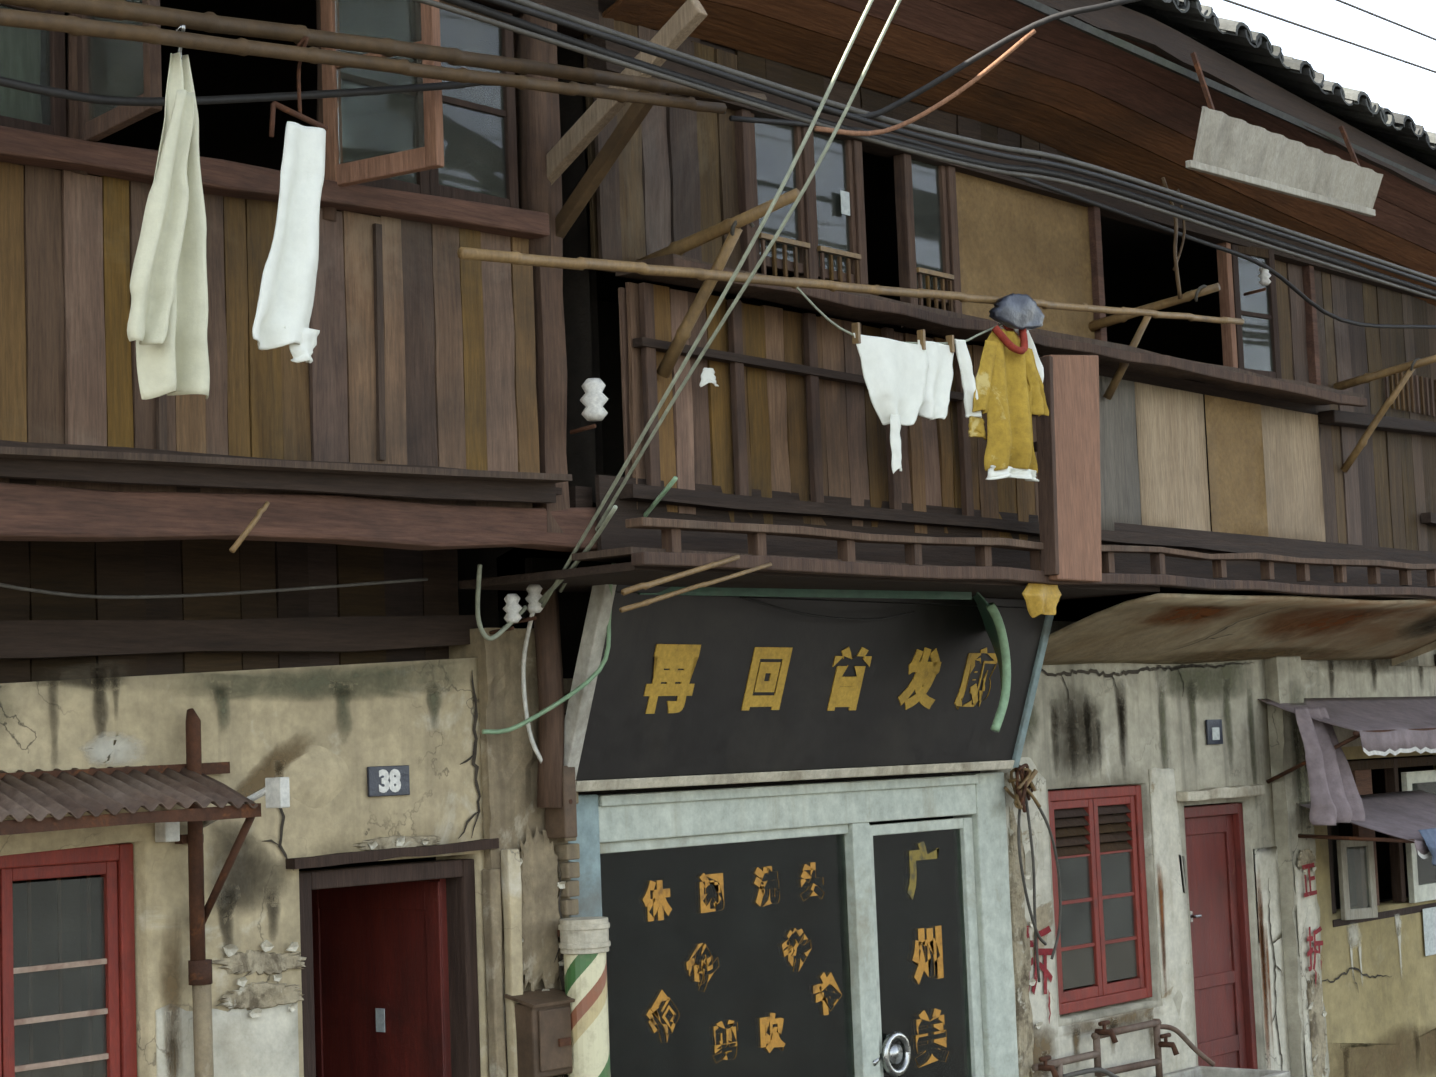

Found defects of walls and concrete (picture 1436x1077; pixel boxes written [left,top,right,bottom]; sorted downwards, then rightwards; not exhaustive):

corrosion [1154,606,1230,624]
corrosion [1267,611,1380,635]
damp [51,663,134,762]
damp [1026,702,1100,766]
damp [1116,689,1127,756]
flaking render [212,940,307,1018]
crack [1322,967,1392,993]